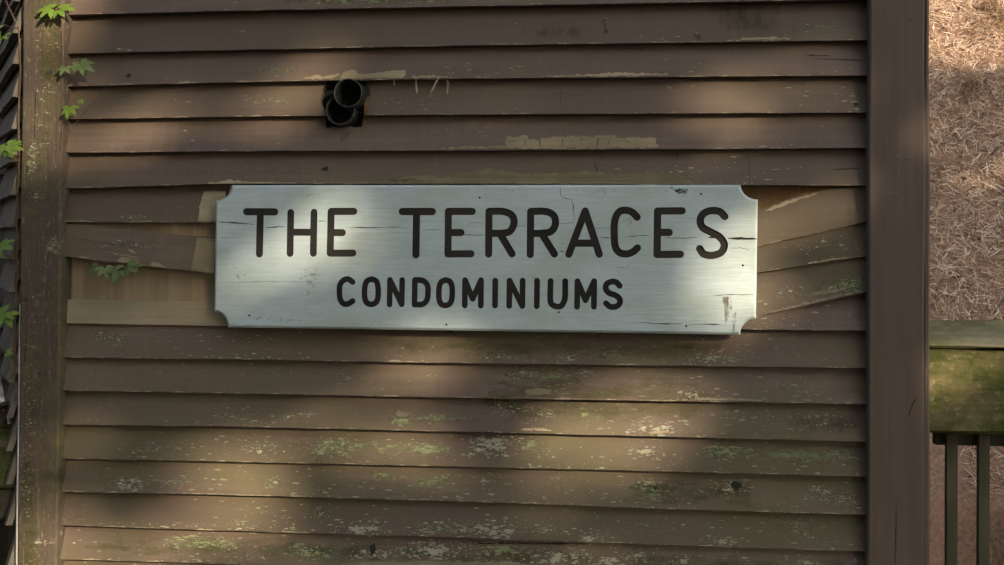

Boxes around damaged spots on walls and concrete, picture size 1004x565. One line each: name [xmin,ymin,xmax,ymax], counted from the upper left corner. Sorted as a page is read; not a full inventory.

spalling [303,69,451,128]
peeling [441,135,658,149]
peeling [191,237,216,273]